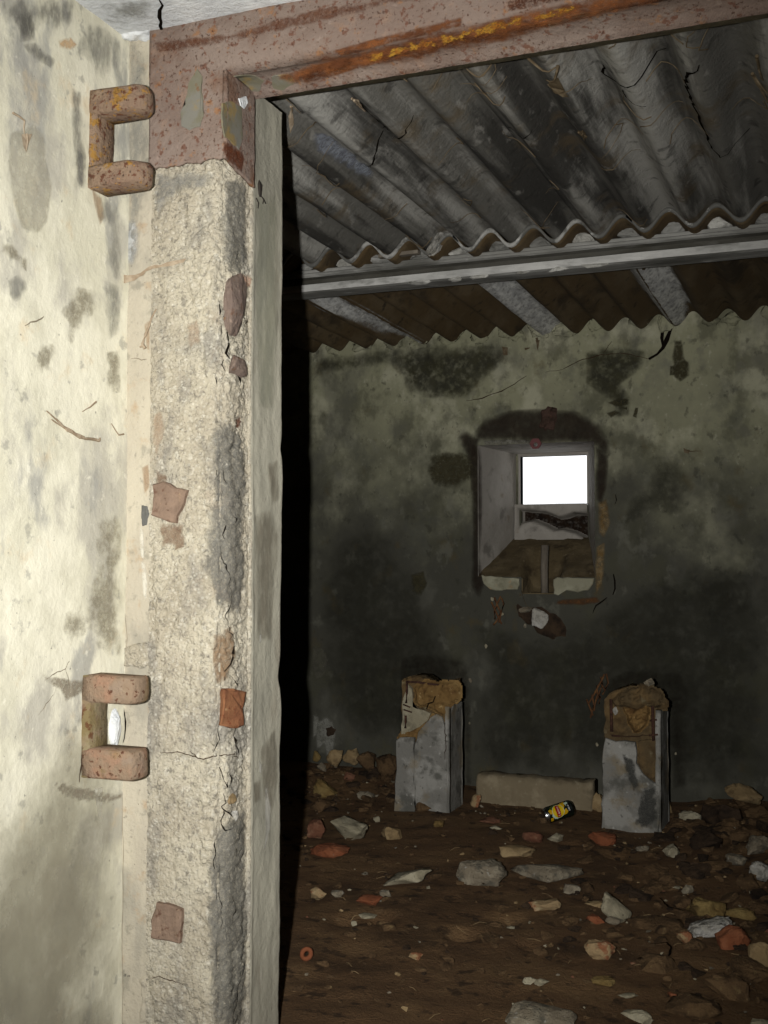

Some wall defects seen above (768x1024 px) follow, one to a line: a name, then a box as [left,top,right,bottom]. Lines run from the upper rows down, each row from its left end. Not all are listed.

damp [10,1,70,37]
crack [156,0,164,30]
corrosion [239,6,359,37]
corrosion [280,0,665,82]
damp [73,96,82,183]
corrosion [224,143,244,169]
damp [588,350,641,417]
damp [430,454,473,486]
crack [220,517,238,685]
spalling [397,678,472,739]
spalling [610,684,669,733]
crack [163,728,239,926]